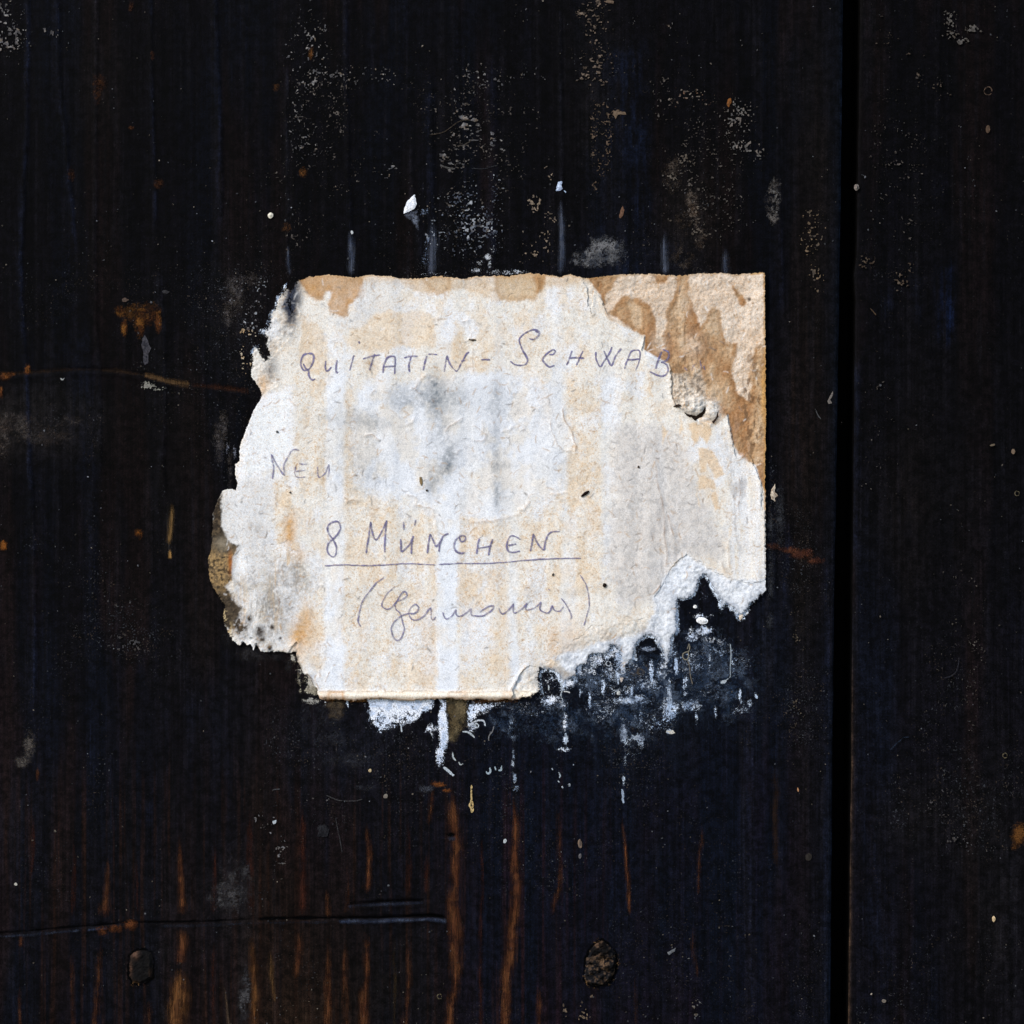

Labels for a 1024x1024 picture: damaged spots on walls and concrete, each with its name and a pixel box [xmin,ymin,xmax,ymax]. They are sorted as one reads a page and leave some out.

peeling [230,278,269,374]
peeling [297,673,326,703]
peeling [367,698,463,776]
peeling [462,702,494,741]